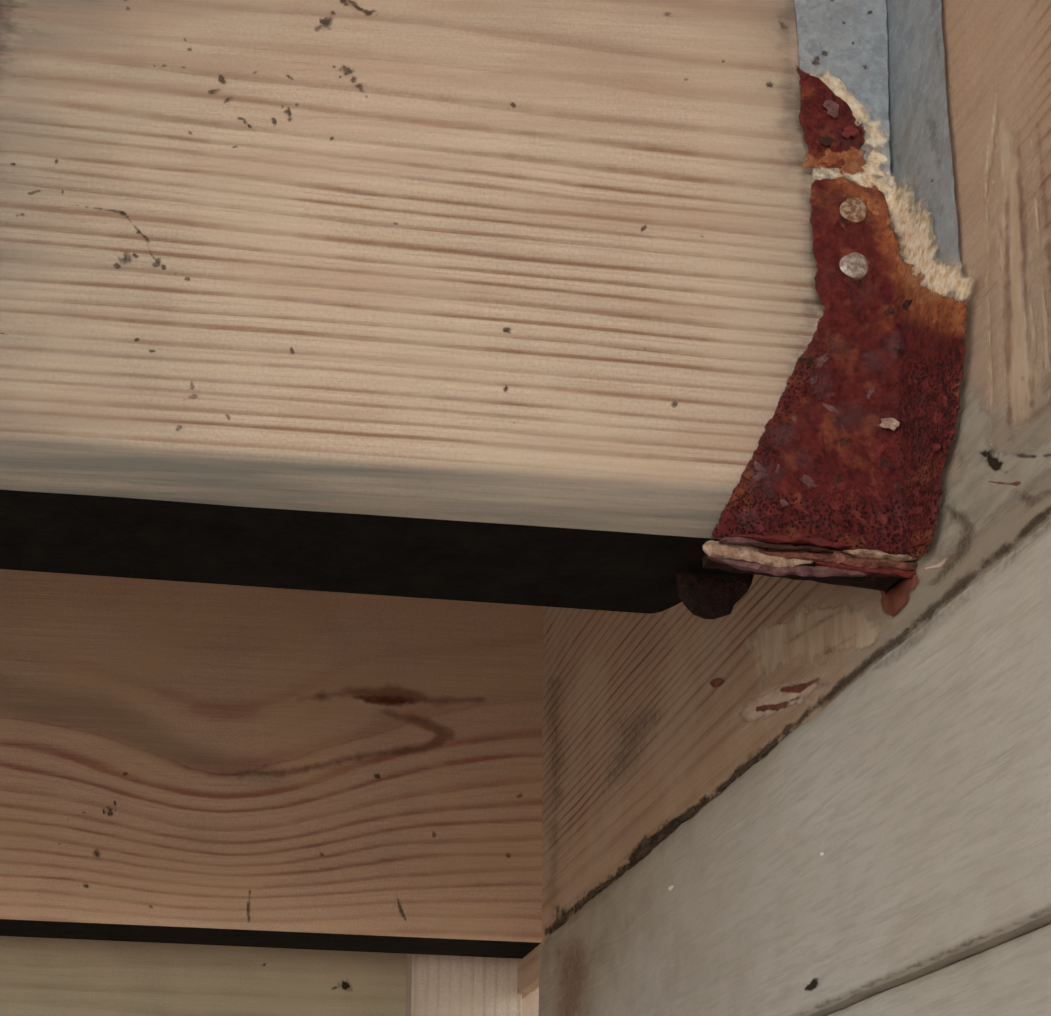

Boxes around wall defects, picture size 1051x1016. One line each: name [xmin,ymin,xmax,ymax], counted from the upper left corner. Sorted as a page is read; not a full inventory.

corrosion [703,66,973,617]